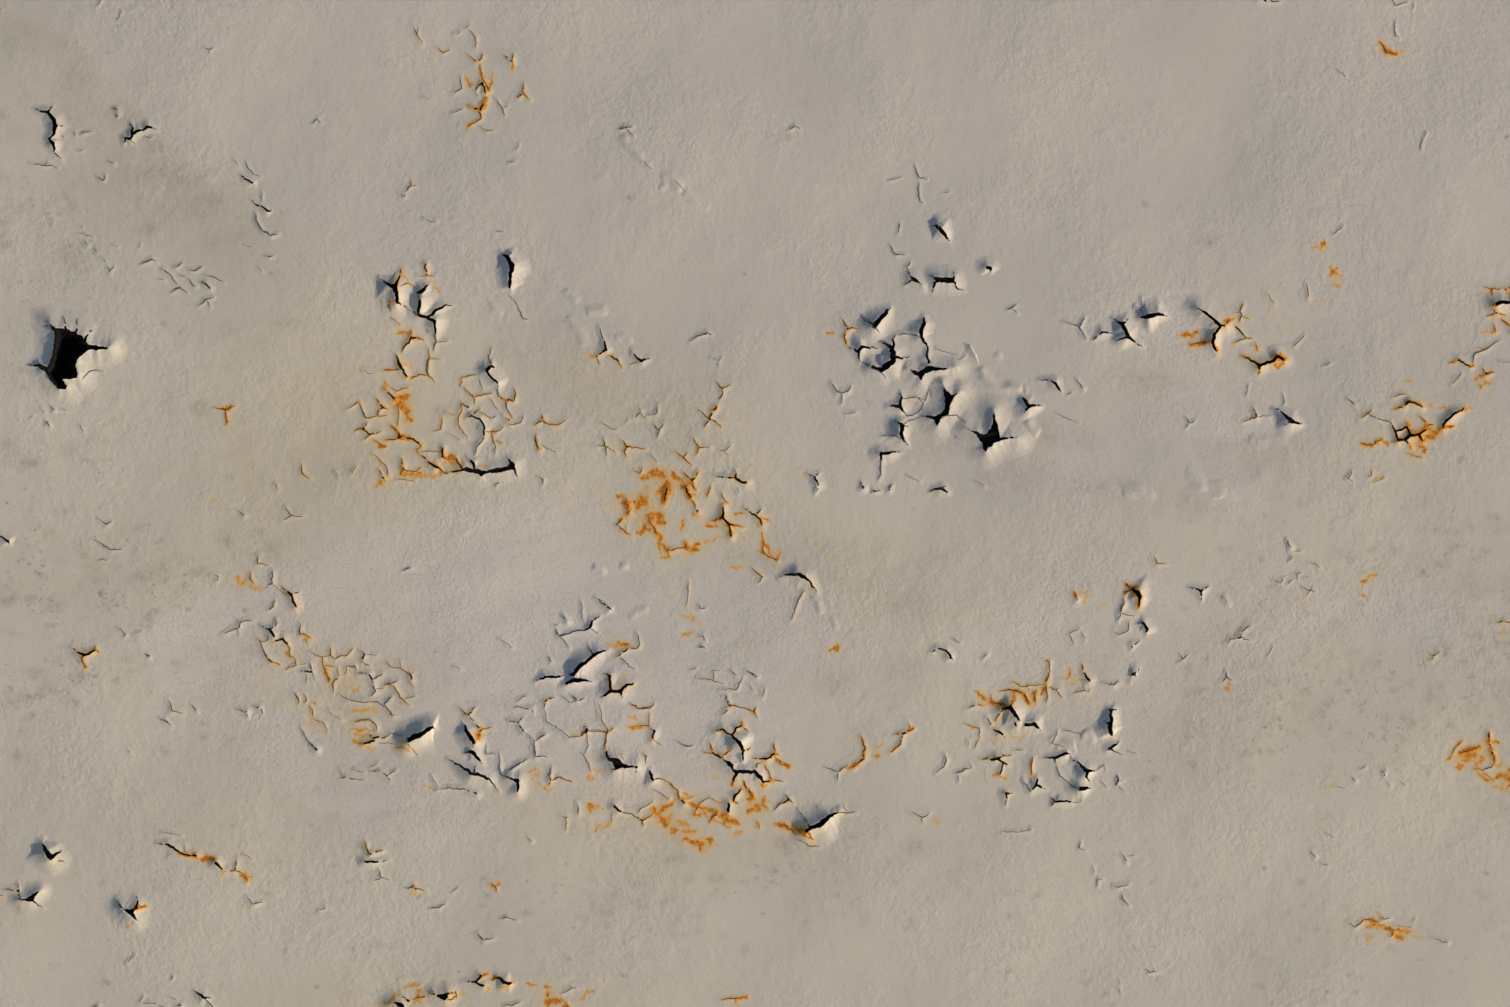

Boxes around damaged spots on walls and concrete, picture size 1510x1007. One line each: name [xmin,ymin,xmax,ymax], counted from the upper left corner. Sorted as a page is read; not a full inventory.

crack [492,228,532,323]
peeling [24,303,130,409]
crack [1012,294,1173,426]
crack [1224,277,1510,499]
corrosion [591,452,713,567]
crack [491,323,988,627]
corrosion [746,527,790,576]
crack [156,695,442,794]
crack [771,535,1325,910]
corrosion [1437,723,1510,803]
corrosion [1323,901,1452,953]
corrosion [517,973,602,1007]